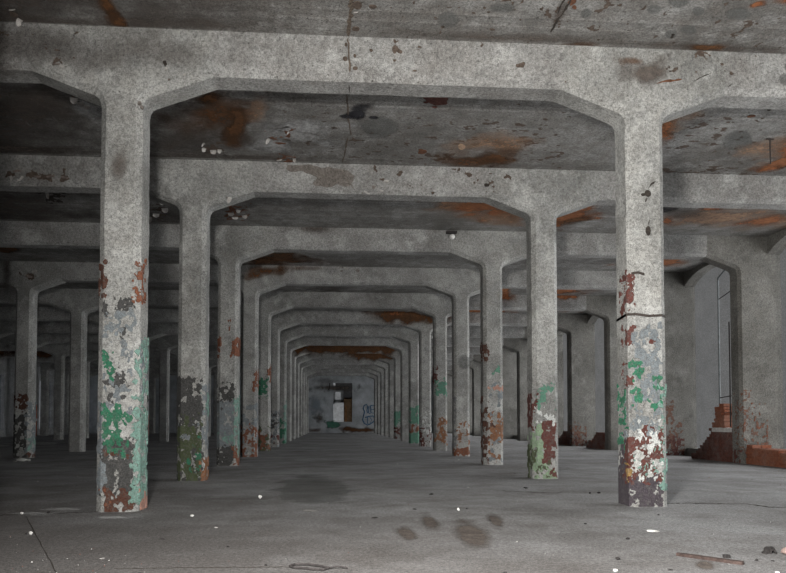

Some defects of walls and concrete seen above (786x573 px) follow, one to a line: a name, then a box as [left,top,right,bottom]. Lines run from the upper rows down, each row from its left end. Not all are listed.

crack [342,0,377,162]
corrosion [196,94,251,147]
corrosion [444,139,520,167]
corrosion [662,121,676,139]
corrosion [440,202,519,223]
corrosion [663,208,786,226]
corrosion [375,311,433,325]
peeling [96,258,149,512]
peeling [617,269,685,515]
peeling [177,364,287,481]
peeling [523,382,558,489]